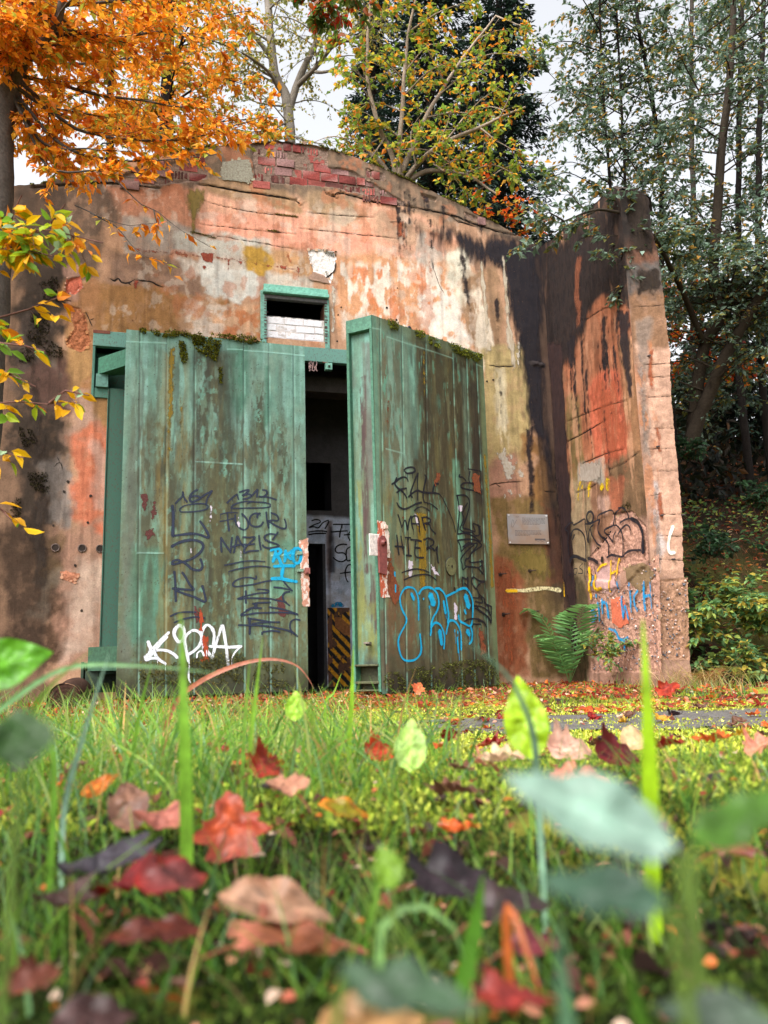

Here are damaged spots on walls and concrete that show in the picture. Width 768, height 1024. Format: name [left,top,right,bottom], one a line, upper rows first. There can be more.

flaking render [120,141,405,206]
flaking render [464,212,486,225]
spalling [307,248,337,283]
spalling [64,276,90,352]
water stain [396,188,661,651]